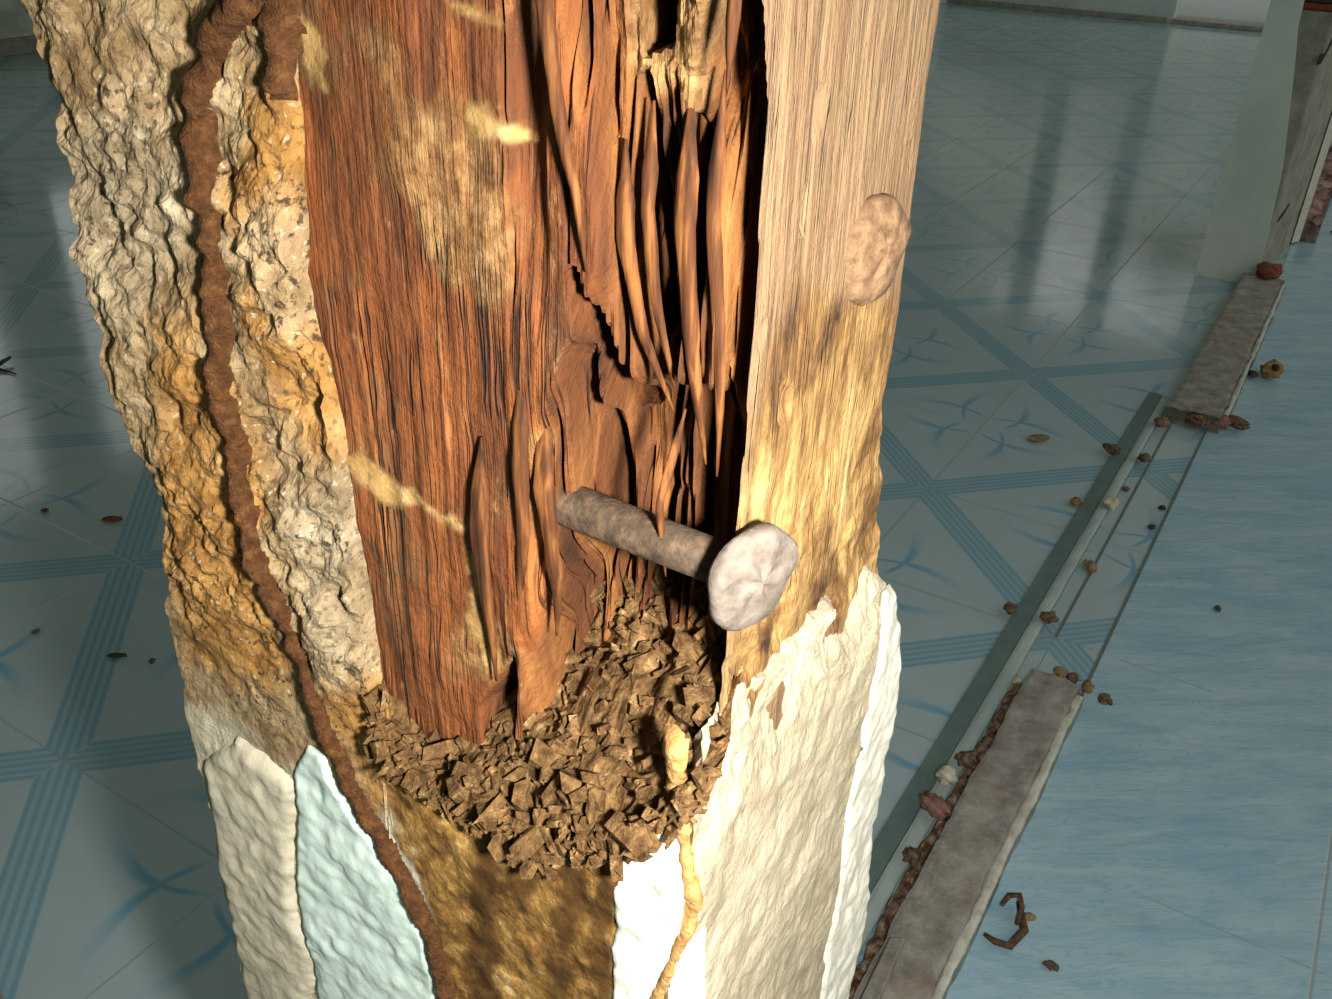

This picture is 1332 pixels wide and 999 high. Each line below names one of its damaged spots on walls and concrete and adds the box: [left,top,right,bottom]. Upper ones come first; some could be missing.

peeling [204,736,438,999]
peeling [611,835,707,999]
peeling [820,583,901,999]